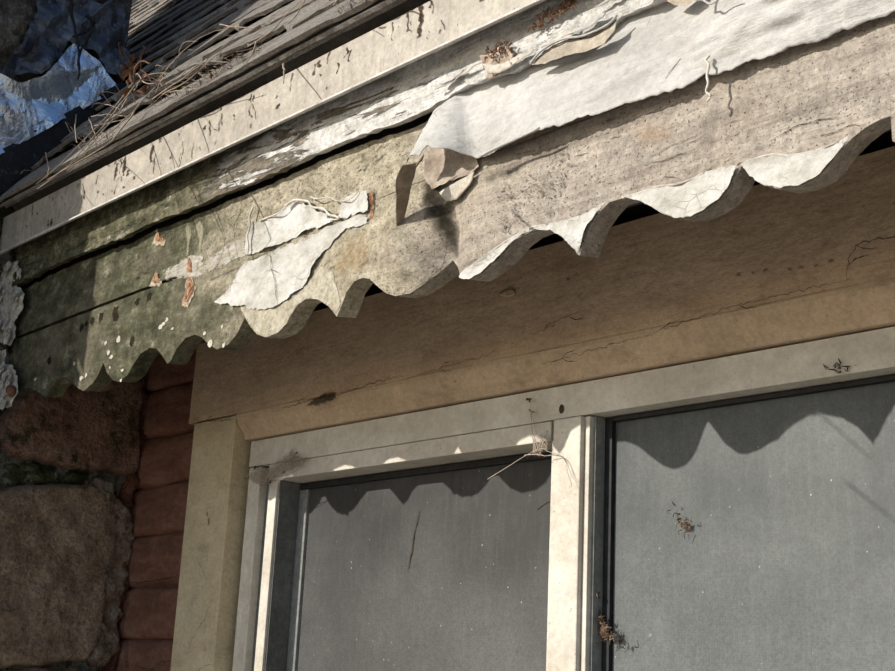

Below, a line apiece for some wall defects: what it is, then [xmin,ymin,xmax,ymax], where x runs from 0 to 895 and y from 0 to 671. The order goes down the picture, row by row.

peeling [395,0,895,226]
leakage [79,306,118,332]
rust [153,229,166,246]
rust [182,258,196,307]
peeling [165,190,368,336]
peeling [459,202,605,279]
crack [542,236,895,364]
crack [275,351,499,412]